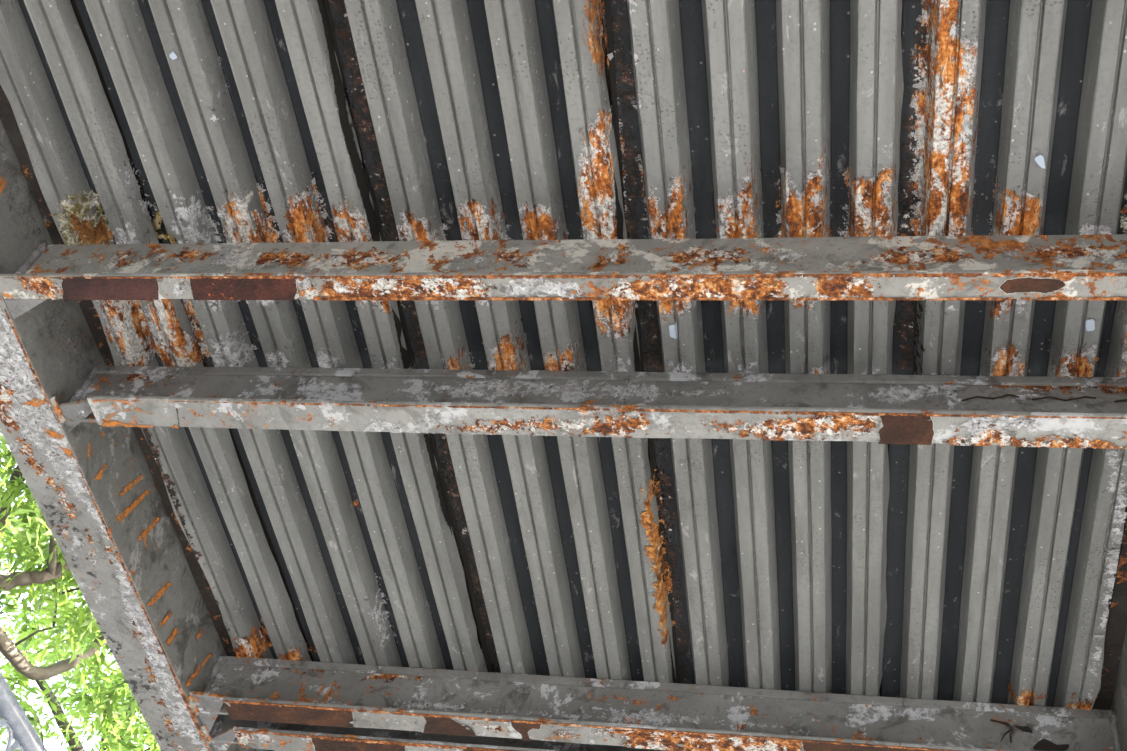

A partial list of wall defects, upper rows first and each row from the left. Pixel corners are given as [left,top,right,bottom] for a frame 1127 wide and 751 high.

corrosion [2,0,1127,394]
corrosion [169,401,1127,449]
peeling [0,308,208,751]
corrosion [0,298,212,751]
corrosion [222,621,952,751]
corrosion [1008,682,1048,706]
corrosion [1059,693,1093,711]